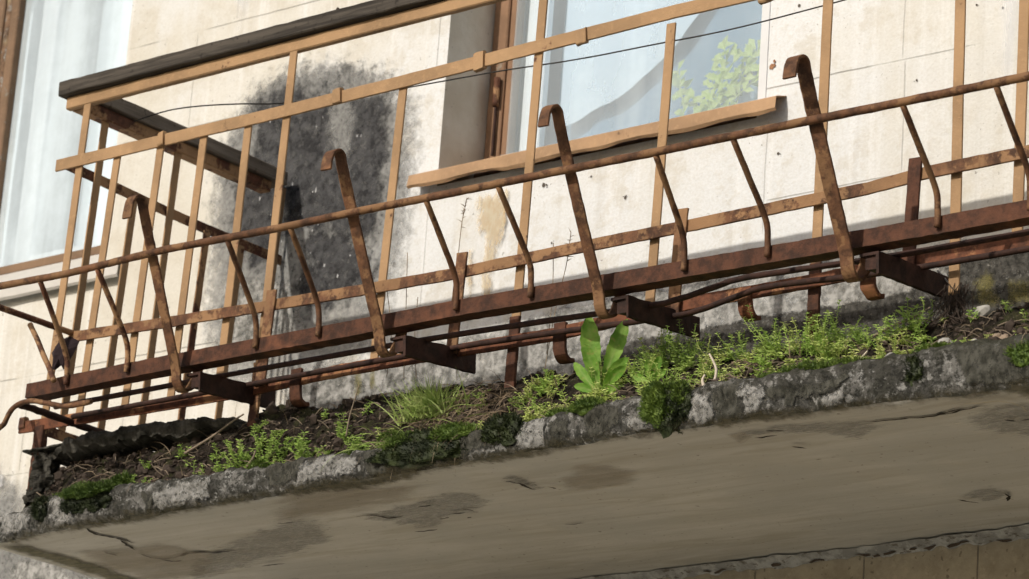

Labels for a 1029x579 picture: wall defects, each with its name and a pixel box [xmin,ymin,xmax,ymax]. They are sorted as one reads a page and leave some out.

damp [208,63,414,346]
corrosion [466,190,508,295]
crack [87,528,233,562]